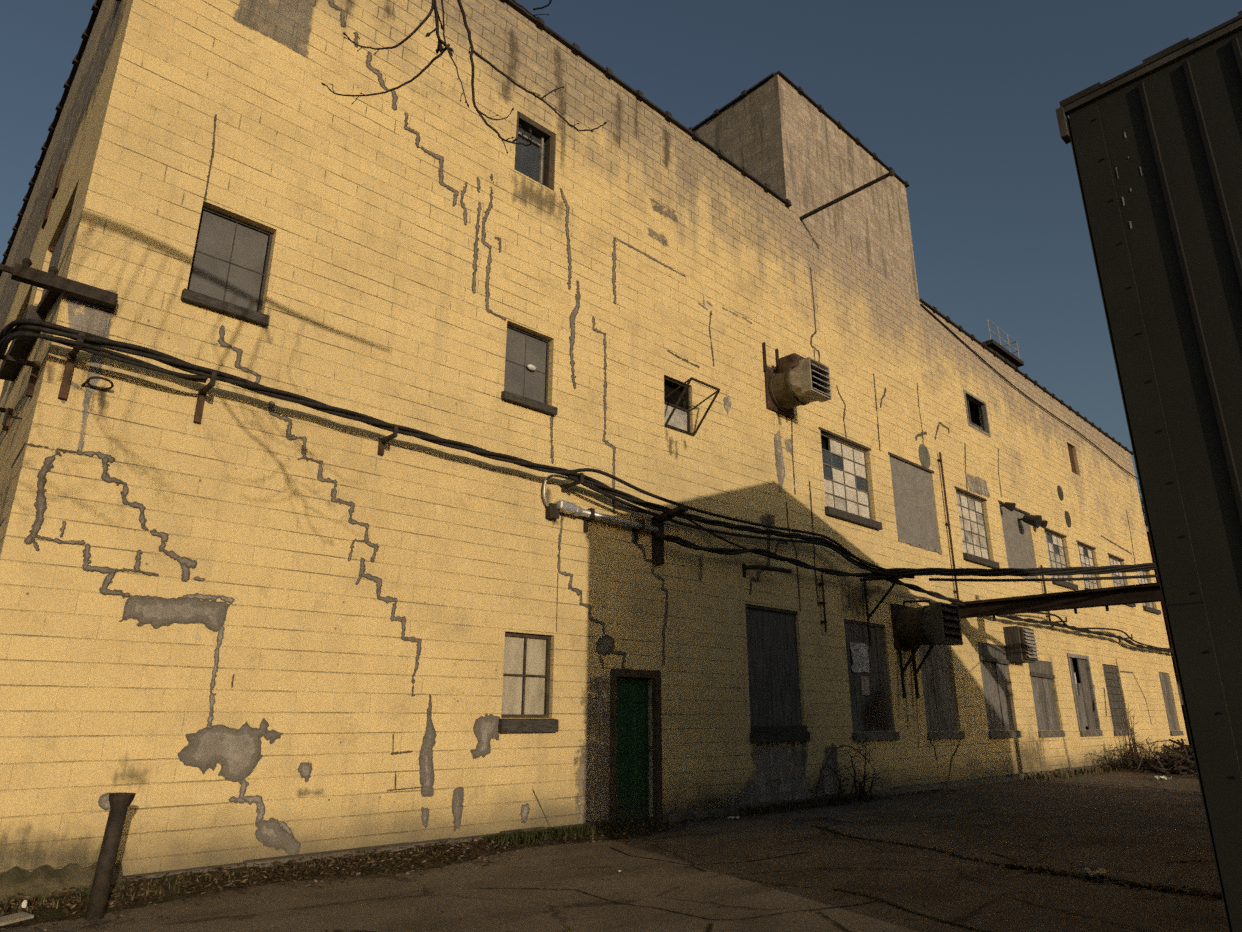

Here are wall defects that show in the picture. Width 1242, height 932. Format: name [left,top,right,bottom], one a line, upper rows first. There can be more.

spalling [233,0,317,56]
crack [328,0,506,321]
crack [556,188,686,669]
crack [0,442,205,598]
crack [217,325,422,697]
spalling [119,593,301,855]
spalling [418,695,437,828]
spalling [452,787,464,831]
spalling [471,713,500,759]